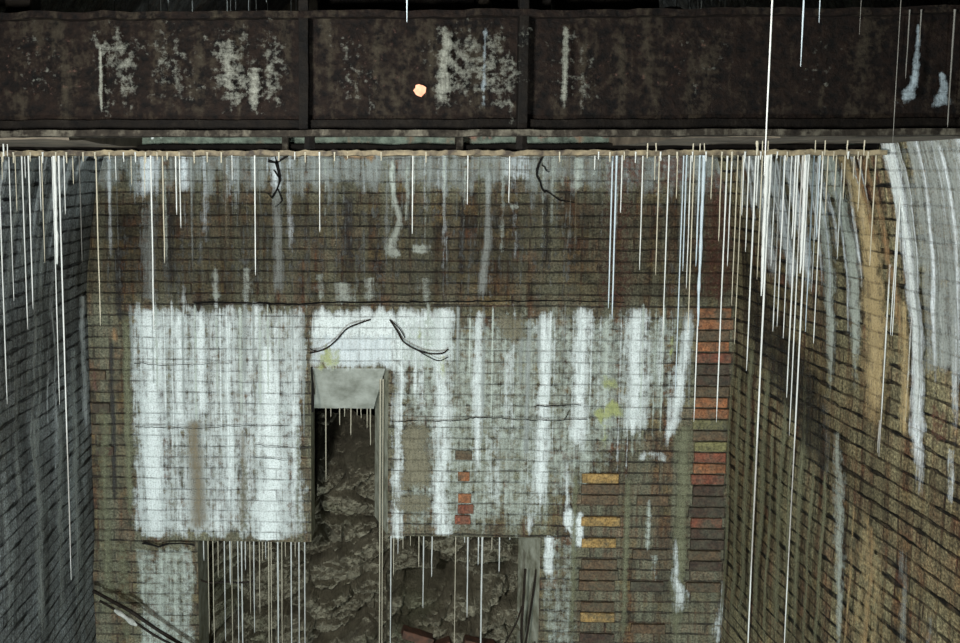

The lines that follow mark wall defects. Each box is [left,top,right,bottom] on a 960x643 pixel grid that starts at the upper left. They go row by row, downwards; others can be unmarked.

rust [413,84,426,97]
crack [268,156,288,207]
crack [536,156,575,203]
efflorescence [882,139,960,479]
leakage [0,155,720,643]